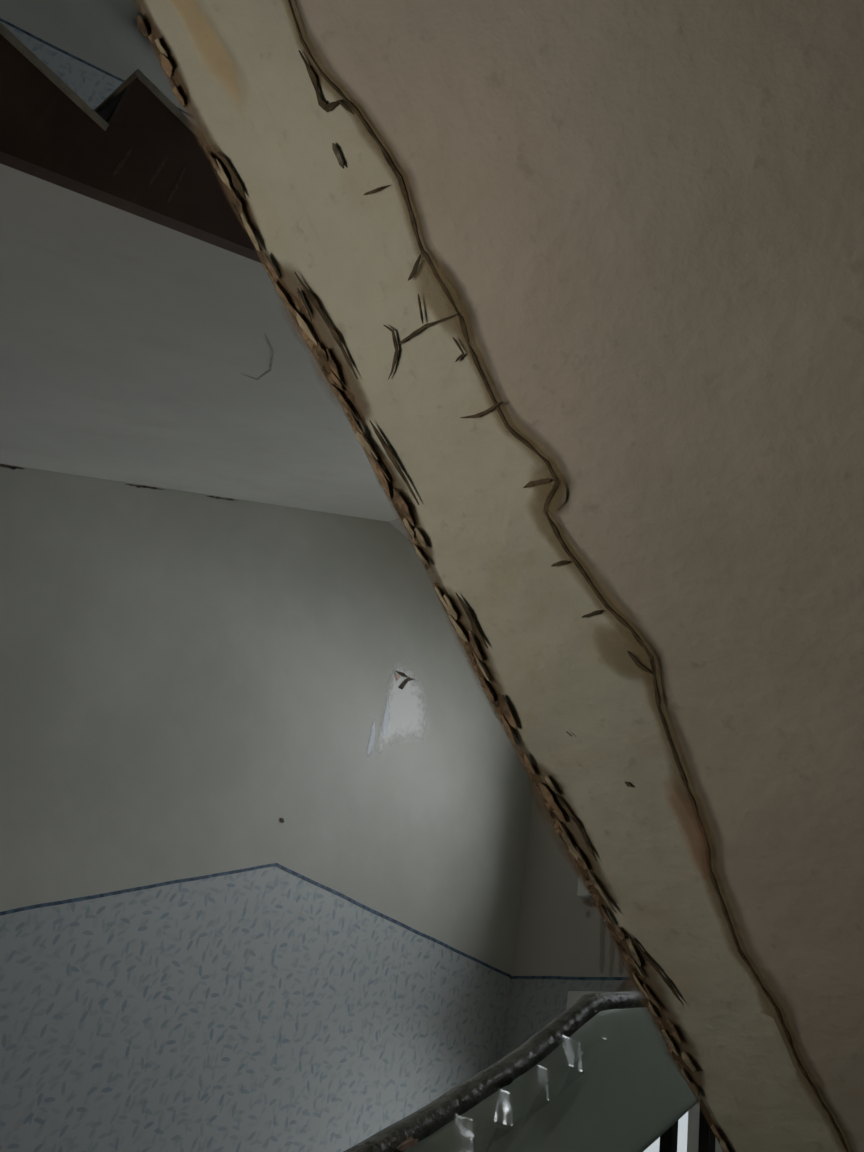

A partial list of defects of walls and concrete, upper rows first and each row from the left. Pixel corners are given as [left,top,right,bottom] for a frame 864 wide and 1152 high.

crack [288,0,849,1152]